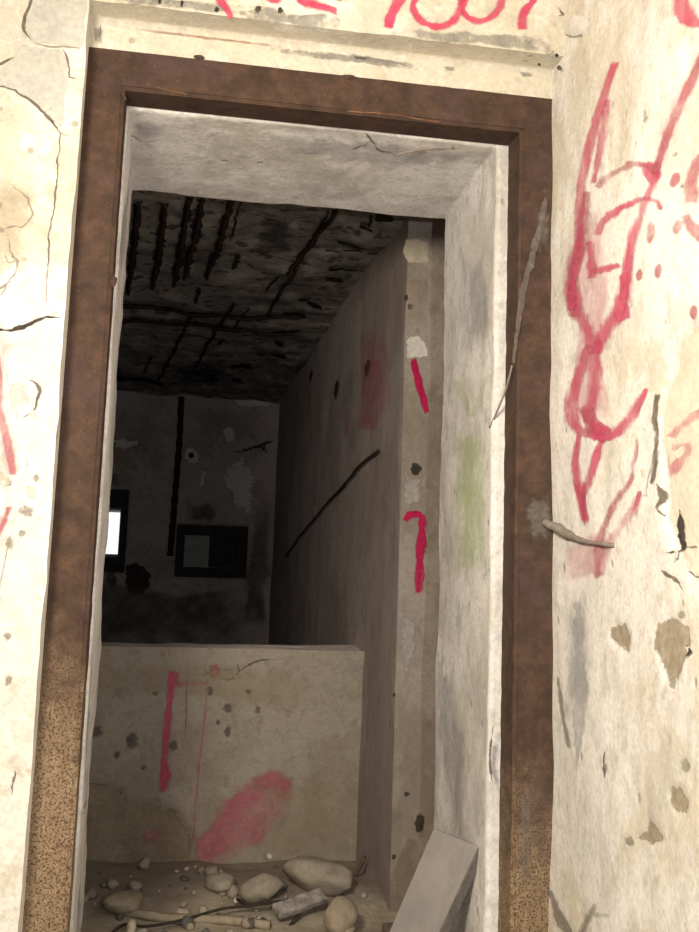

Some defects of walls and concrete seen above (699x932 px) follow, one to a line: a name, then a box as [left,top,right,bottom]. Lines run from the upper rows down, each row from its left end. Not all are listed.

flaking render [21,0,86,49]
crack [0,57,67,332]
spalling [122,198,339,382]
leakage [101,577,222,635]